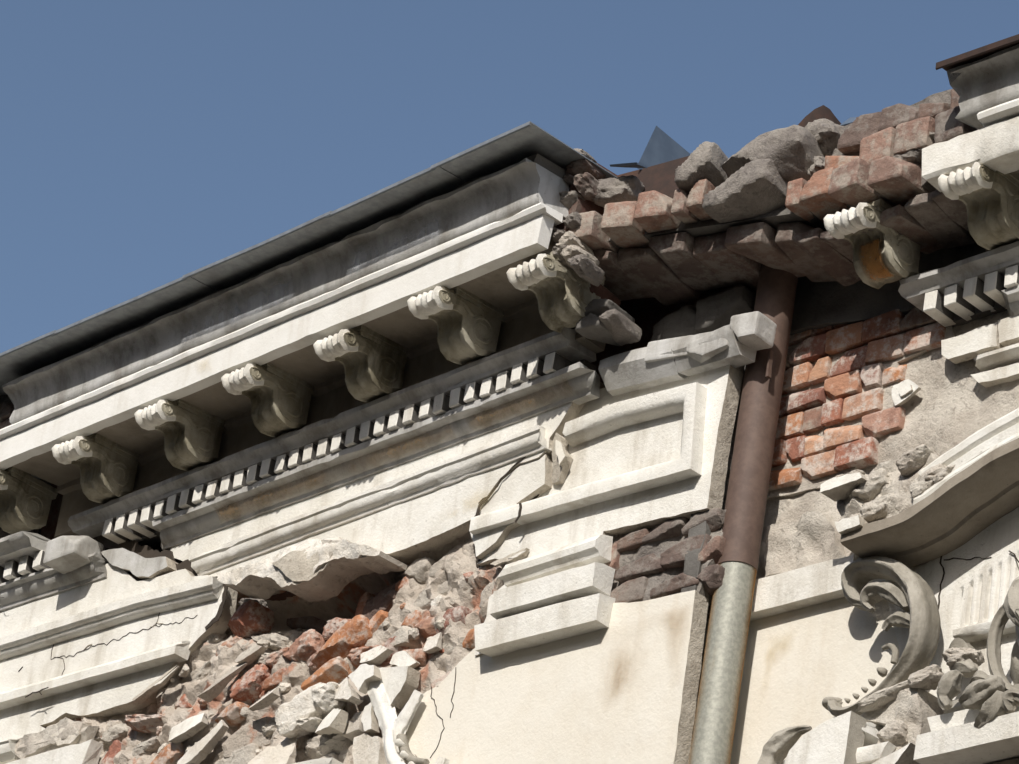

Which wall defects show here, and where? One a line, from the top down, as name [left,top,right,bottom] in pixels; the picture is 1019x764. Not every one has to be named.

spalling [551,89,977,346]
spalling [0,395,14,429]
crack [25,535,231,698]
spalling [15,531,530,764]
crack [474,457,525,517]
crack [514,494,539,522]
spalling [605,508,726,618]
spalling [756,307,956,580]
crack [938,550,1019,609]